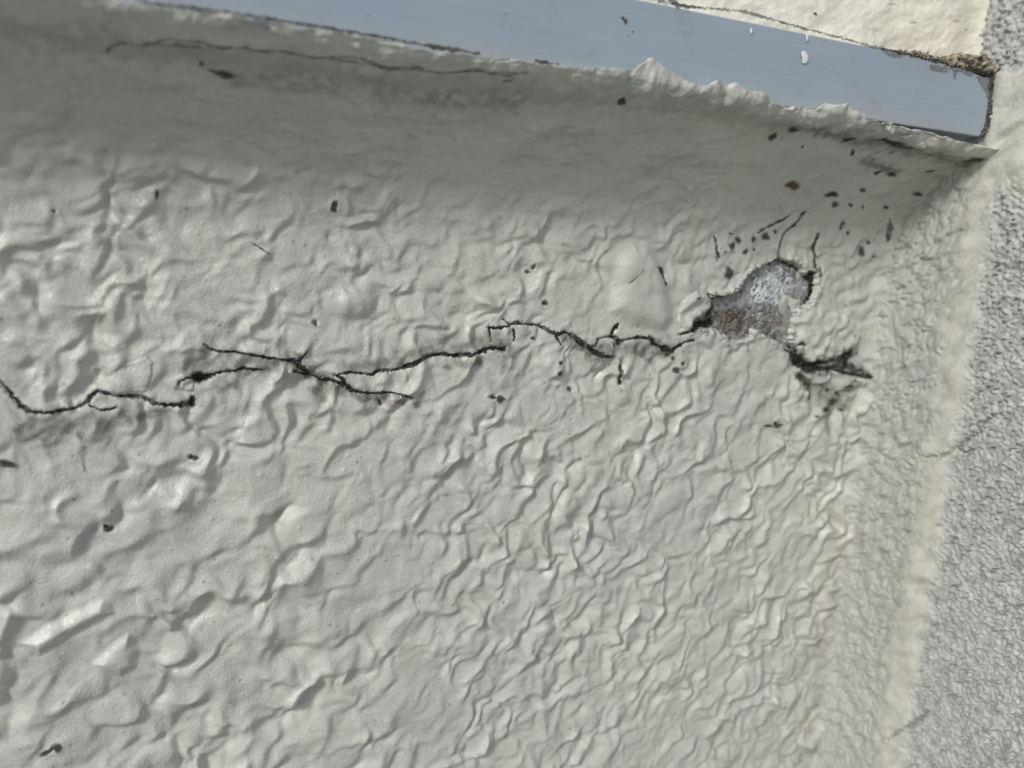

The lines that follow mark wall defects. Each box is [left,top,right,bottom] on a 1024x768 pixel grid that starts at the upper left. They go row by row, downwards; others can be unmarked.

spalling [677,258,861,362]
crack [0,318,708,415]
crack [779,341,872,379]